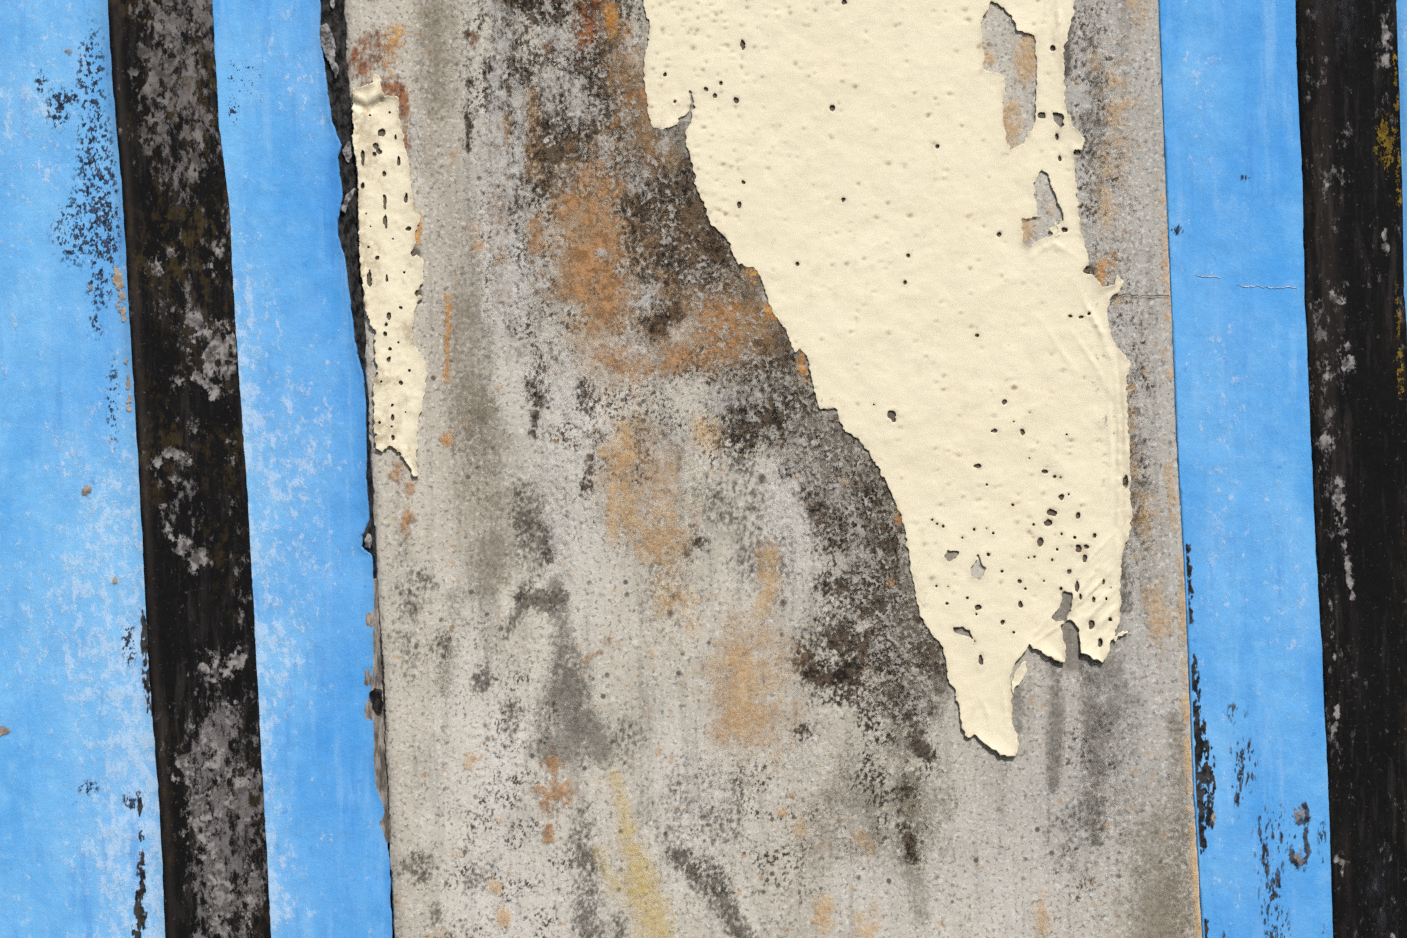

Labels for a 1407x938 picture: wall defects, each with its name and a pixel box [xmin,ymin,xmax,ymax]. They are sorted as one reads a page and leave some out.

peeling [341,74,428,477]
rust [529,89,675,334]
rust [599,290,776,376]
damp [459,0,946,864]
peeling [643,0,1133,757]
damp [395,568,451,677]
peeling [1186,543,1194,624]
damp [444,863,533,902]
rust [534,756,574,842]
damp [666,765,818,938]
peeling [1192,654,1256,854]
peeling [1258,802,1344,938]